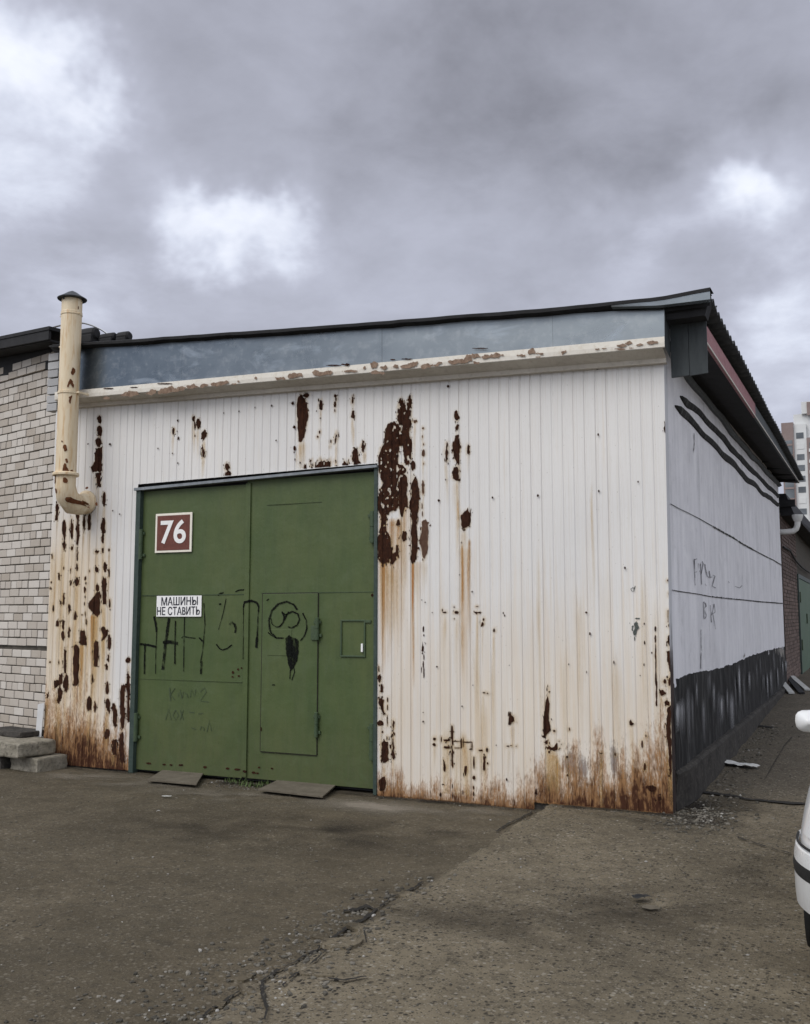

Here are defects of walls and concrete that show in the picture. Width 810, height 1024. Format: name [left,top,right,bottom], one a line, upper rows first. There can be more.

peeling [103,380,239,399]
rust [291,393,366,469]
peeling [275,352,504,380]
peeling [595,341,658,350]
rust [44,415,131,770]
rust [371,393,473,678]
rust [377,623,673,814]
crack [202,882,422,1019]